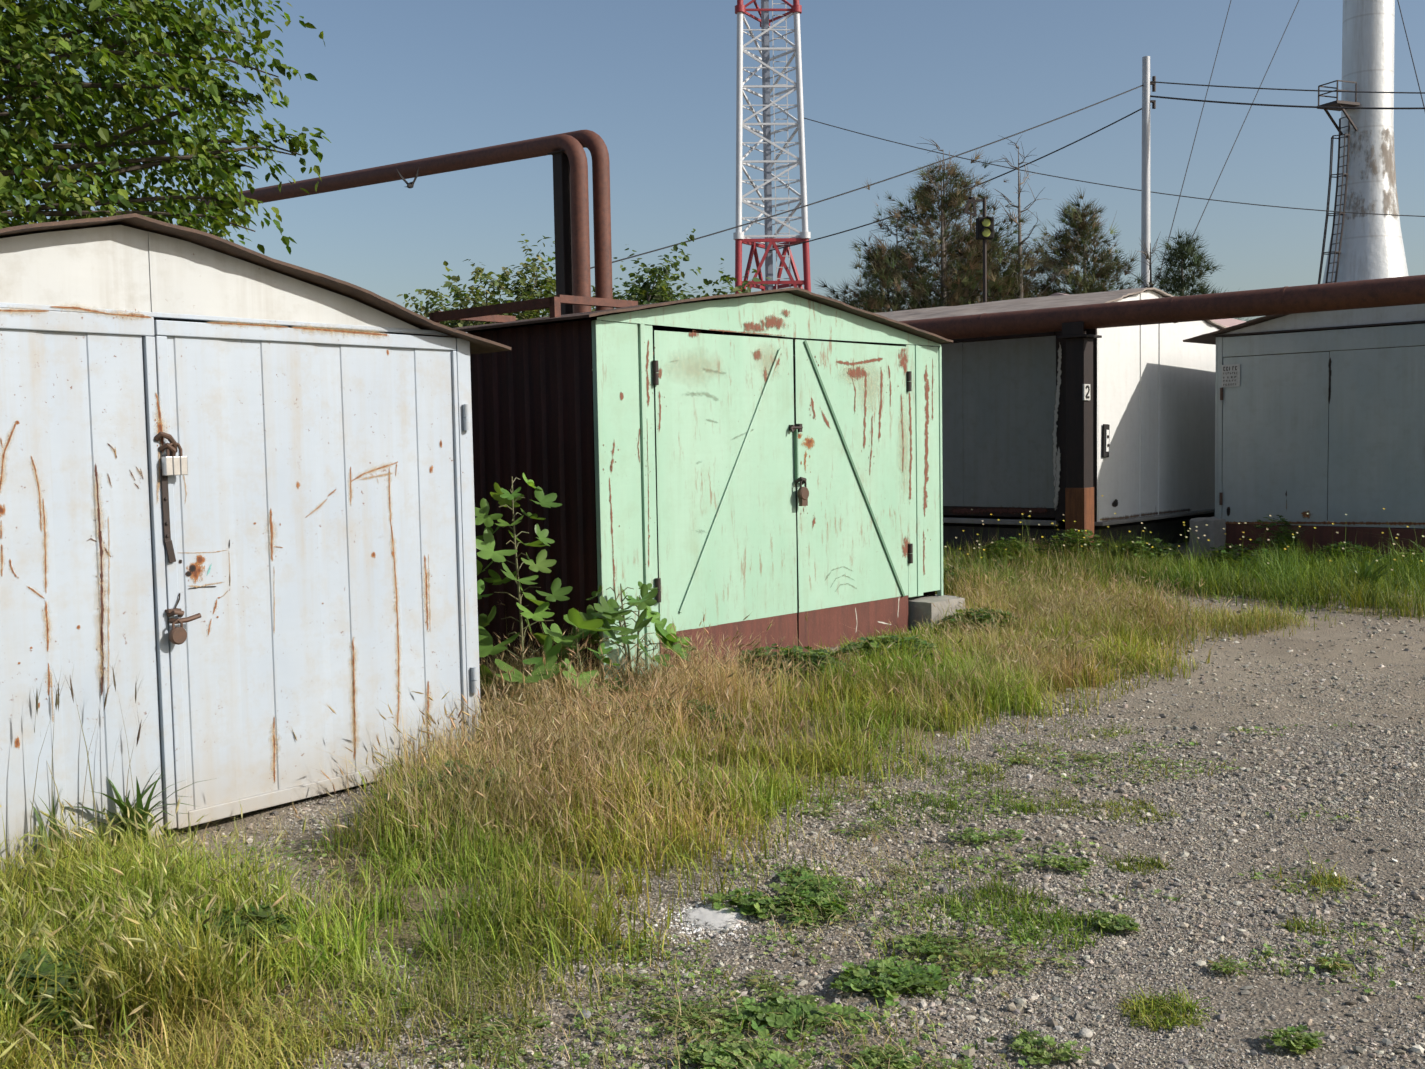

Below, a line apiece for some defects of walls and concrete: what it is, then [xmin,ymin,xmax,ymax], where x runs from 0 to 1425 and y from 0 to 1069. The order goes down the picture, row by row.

corrosion [0,420,20,571]
corrosion [30,456,53,708]
corrosion [87,465,113,695]
corrosion [179,550,230,635]
corrosion [328,461,400,732]